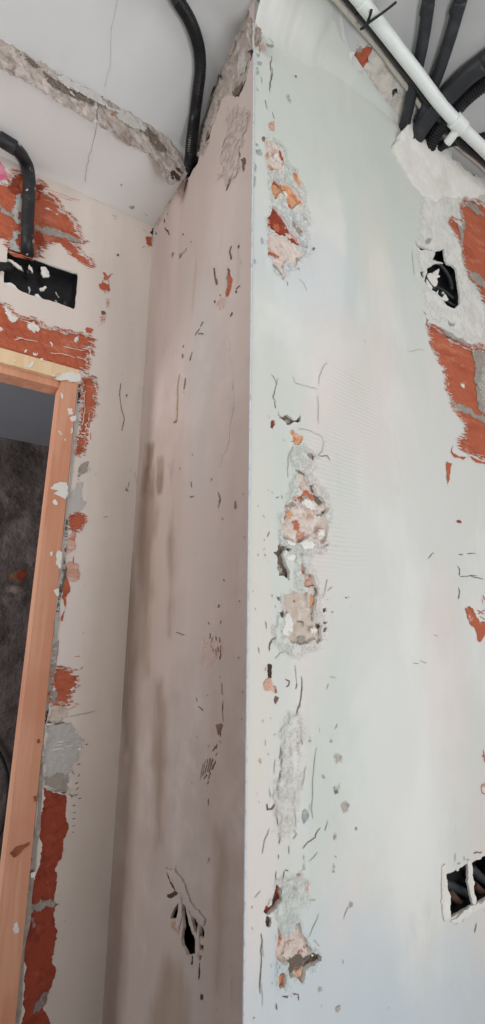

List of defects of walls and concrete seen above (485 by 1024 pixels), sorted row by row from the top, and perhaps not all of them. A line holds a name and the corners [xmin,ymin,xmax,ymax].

flaking render [0,169,95,268]
spalling [20,54,95,105]
crack [85,2,117,181]
flaking render [218,20,315,284]
flaking render [447,198,485,304]
flaking render [0,302,100,457]
flaking render [425,323,485,460]
flaking render [270,412,332,658]
flaking render [48,665,83,706]
flaking render [465,596,485,642]
flaking render [21,788,69,1024]
flaking render [264,870,319,987]